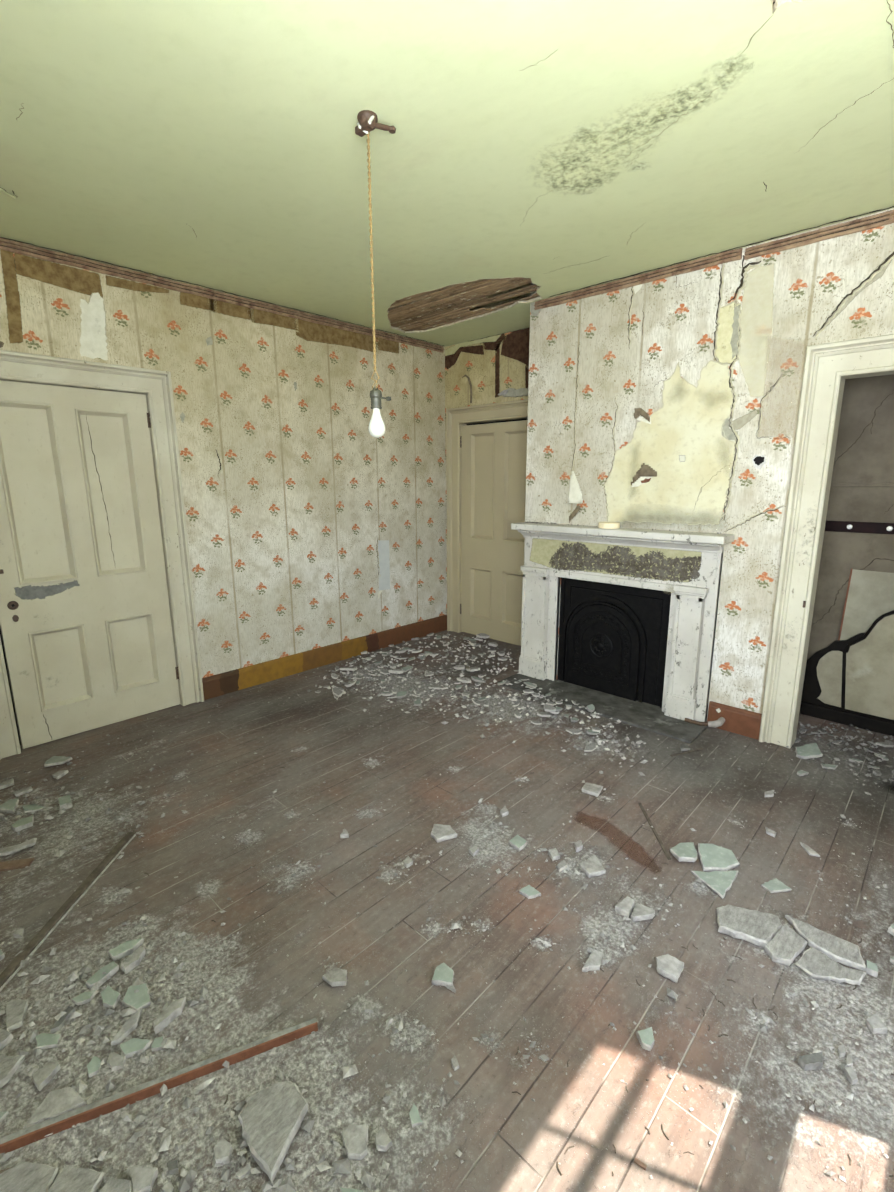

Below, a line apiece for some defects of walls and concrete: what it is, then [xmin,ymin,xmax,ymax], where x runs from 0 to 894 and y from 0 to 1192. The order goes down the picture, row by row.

crack [886,1,894,48]
peeling [14,253,399,353]
spalling [714,301,741,364]
crack [549,206,894,532]
spalling [722,419,739,441]
peeling [530,538,702,582]